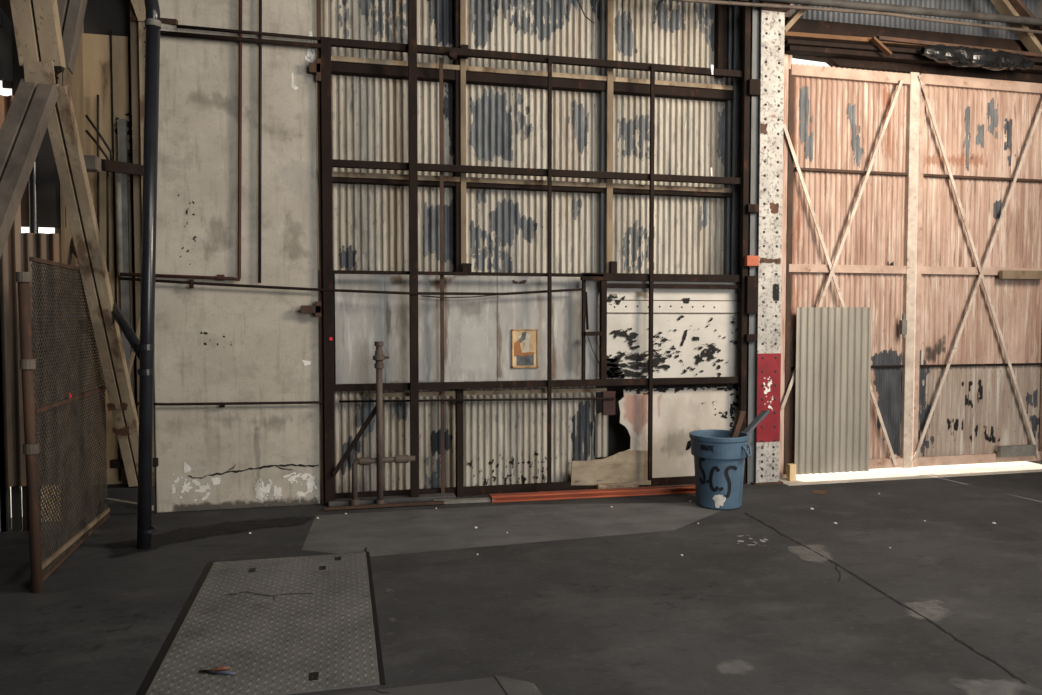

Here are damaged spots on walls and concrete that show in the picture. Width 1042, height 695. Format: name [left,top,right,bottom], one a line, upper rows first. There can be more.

peeling [607,298,739,395]
flaking render [172,462,221,501]
crack [188,464,319,479]
flaking render [253,472,319,506]